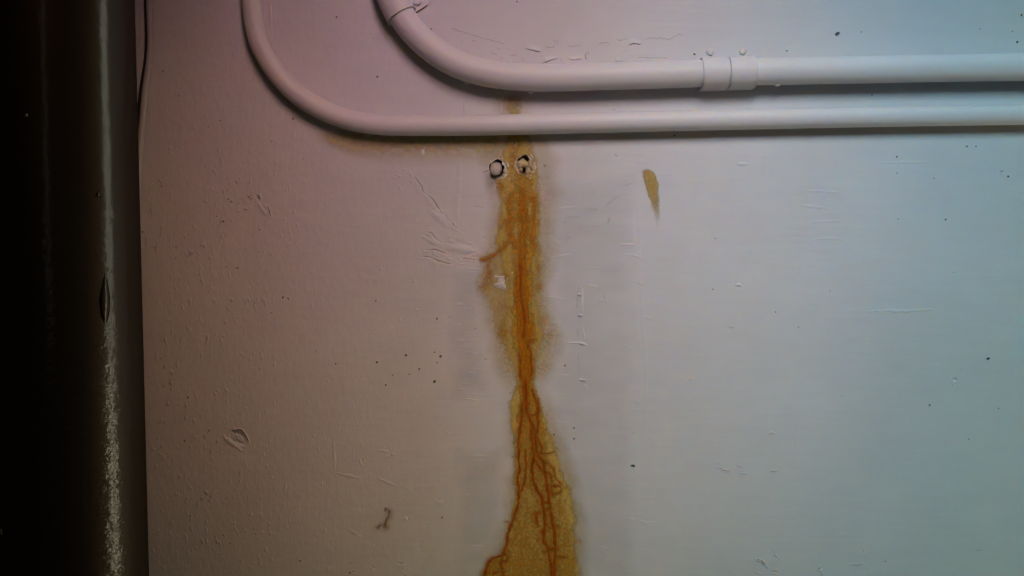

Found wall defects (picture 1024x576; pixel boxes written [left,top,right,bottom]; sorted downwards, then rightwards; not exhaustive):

rust [480,135,579,576]
rust [643,170,658,210]